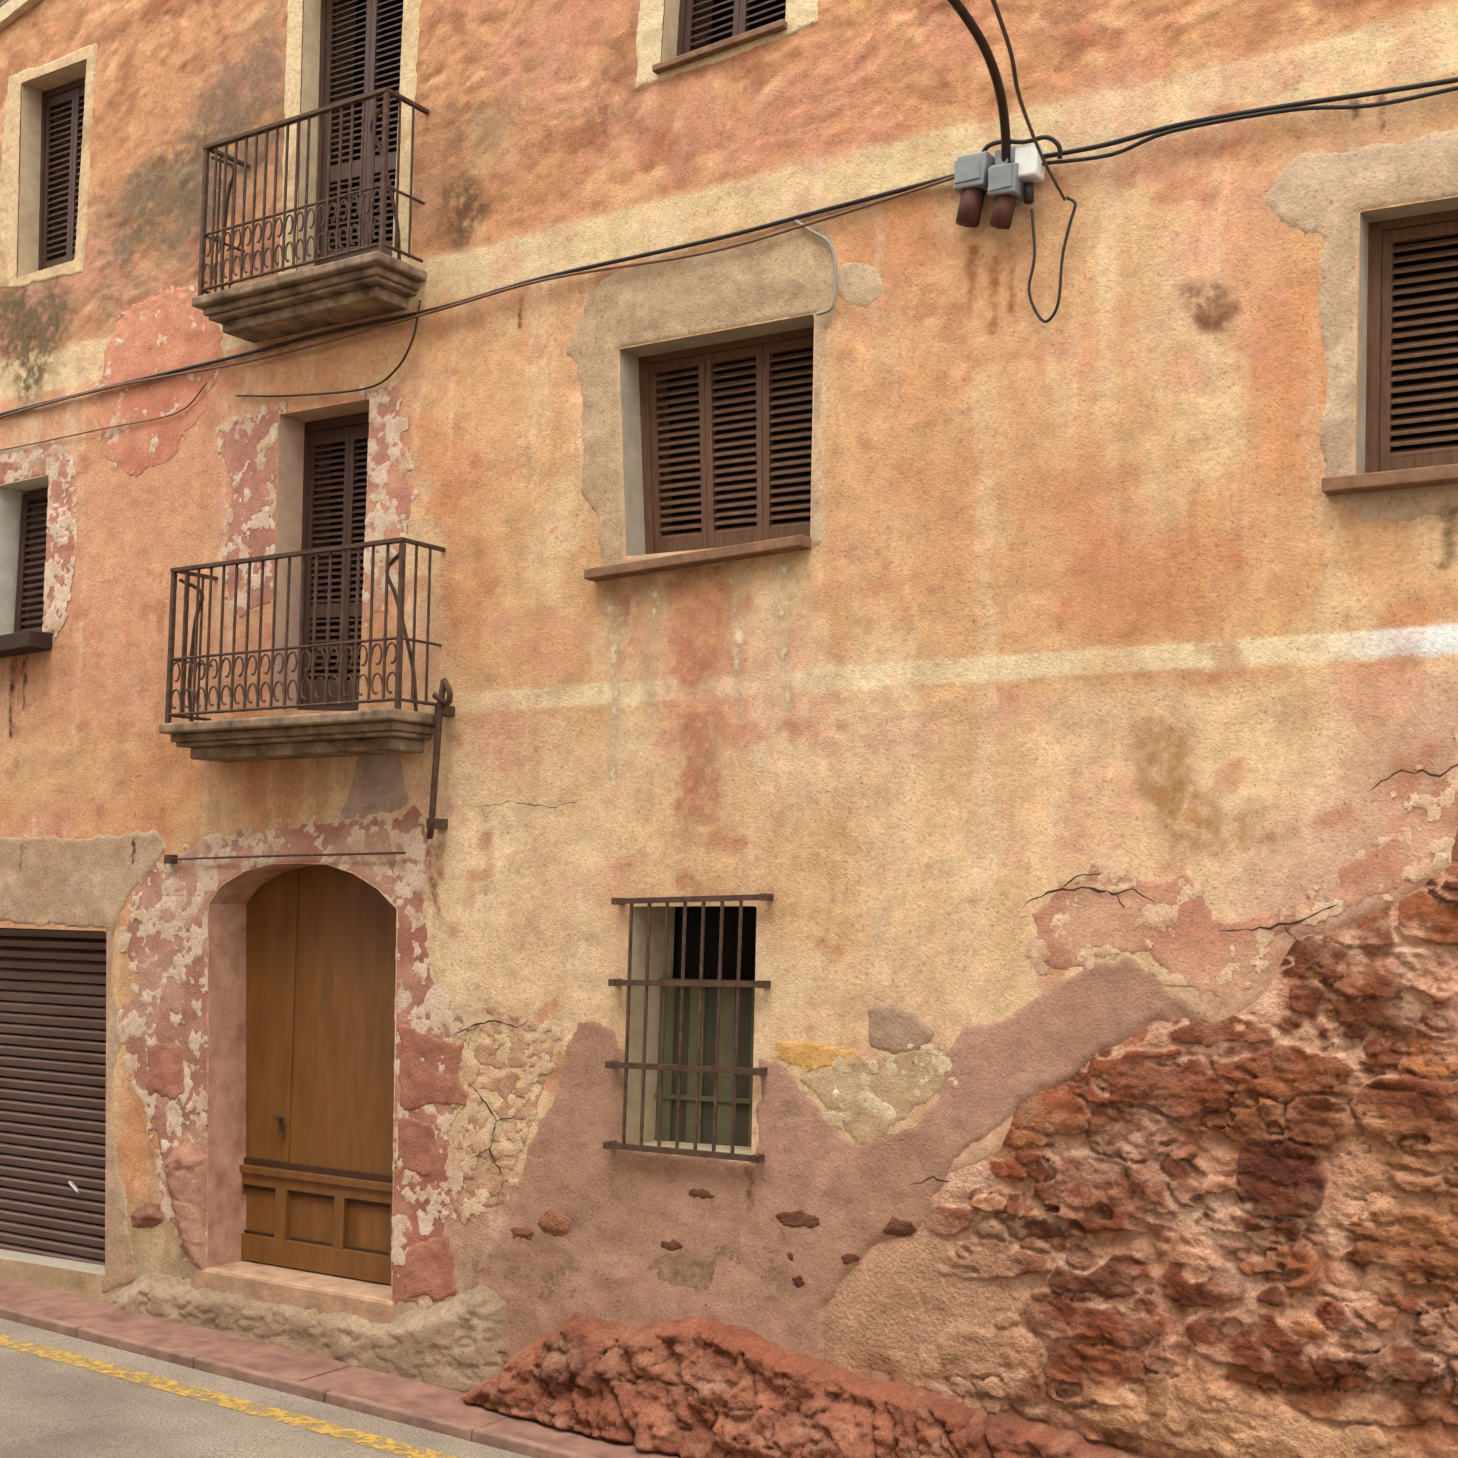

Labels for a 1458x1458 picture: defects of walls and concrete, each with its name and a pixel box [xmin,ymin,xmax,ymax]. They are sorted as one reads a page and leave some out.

damp [0,282,67,400]
peeling [94,285,228,478]
peeling [0,439,78,641]
peeling [216,401,287,618]
peeling [359,378,418,627]
crack [1367,764,1458,792]
crack [1023,873,1155,908]
peeling [117,805,561,1310]
peeling [770,1040,958,1146]
spalling [823,734,1458,1458]
spalling [510,1209,572,1240]